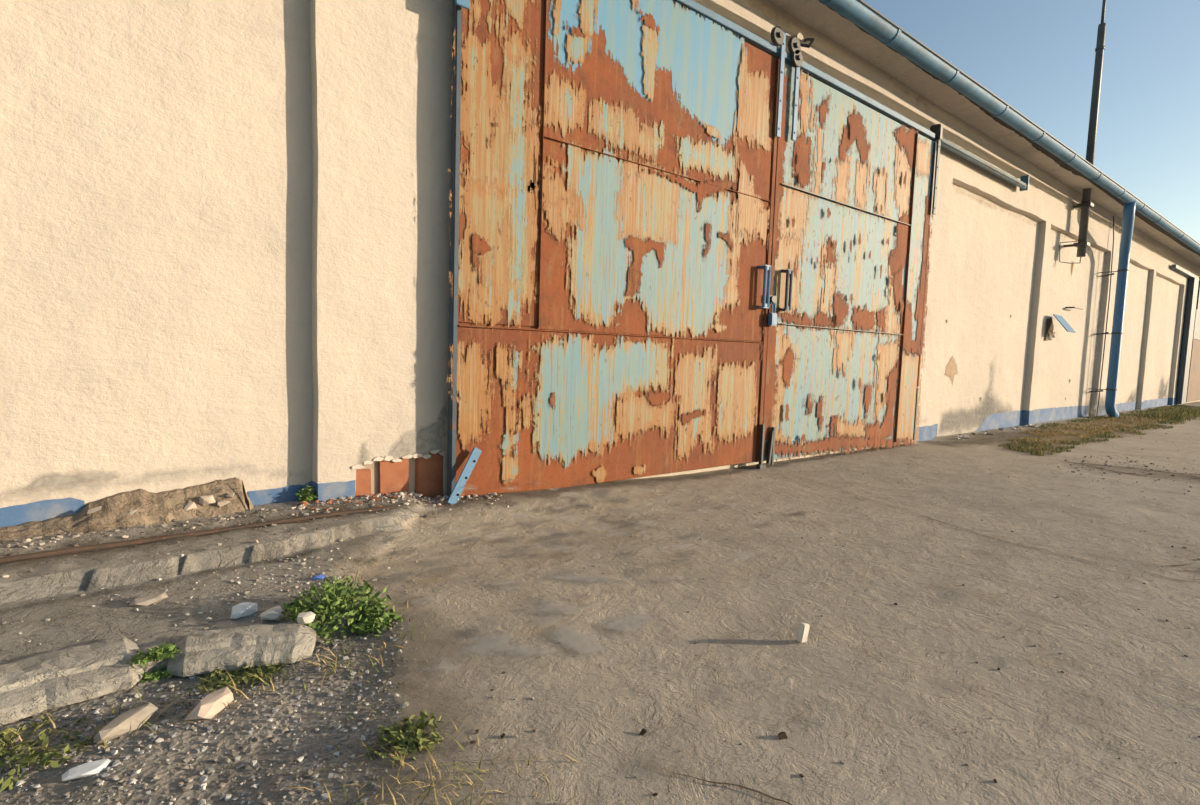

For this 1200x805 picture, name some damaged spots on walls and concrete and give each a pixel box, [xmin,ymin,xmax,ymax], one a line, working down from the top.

corrosion [566,20,592,39]
corrosion [639,8,660,35]
corrosion [766,68,871,259]
corrosion [882,124,919,188]
corrosion [643,167,737,257]
corrosion [472,232,491,285]
peeling [351,0,773,512]
corrosion [625,235,666,296]
corrosion [758,194,933,460]
peeling [945,357,957,384]
corrosion [682,408,706,425]
damp [942,396,1004,430]